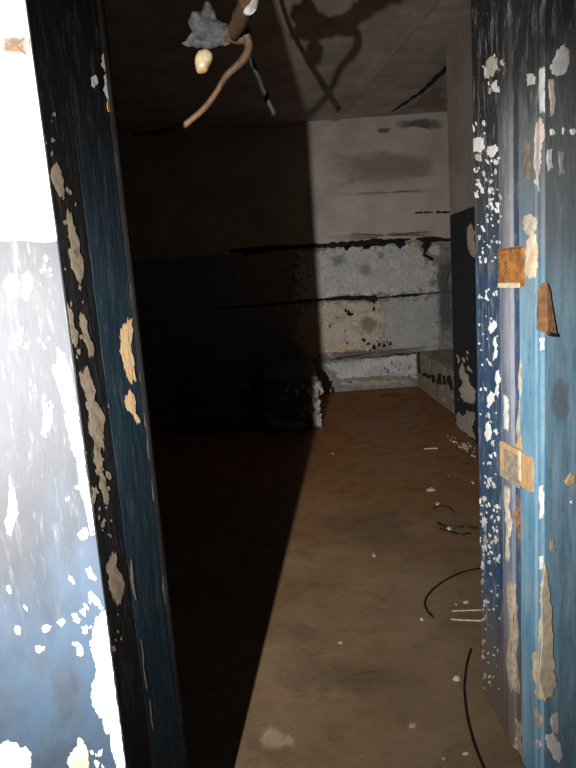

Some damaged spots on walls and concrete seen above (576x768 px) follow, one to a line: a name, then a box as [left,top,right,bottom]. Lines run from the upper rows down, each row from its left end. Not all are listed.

crack [391,65,446,112]
peeling [482,54,505,94]
peeling [523,44,576,194]
peeling [46,138,84,291]
peeling [41,301,113,540]
peeling [120,317,146,427]
crack [205,291,452,310]
crack [229,236,450,262]
spalling [292,242,523,695]
peeling [467,120,502,264]
peeling [522,214,539,279]
peeling [532,539,563,763]